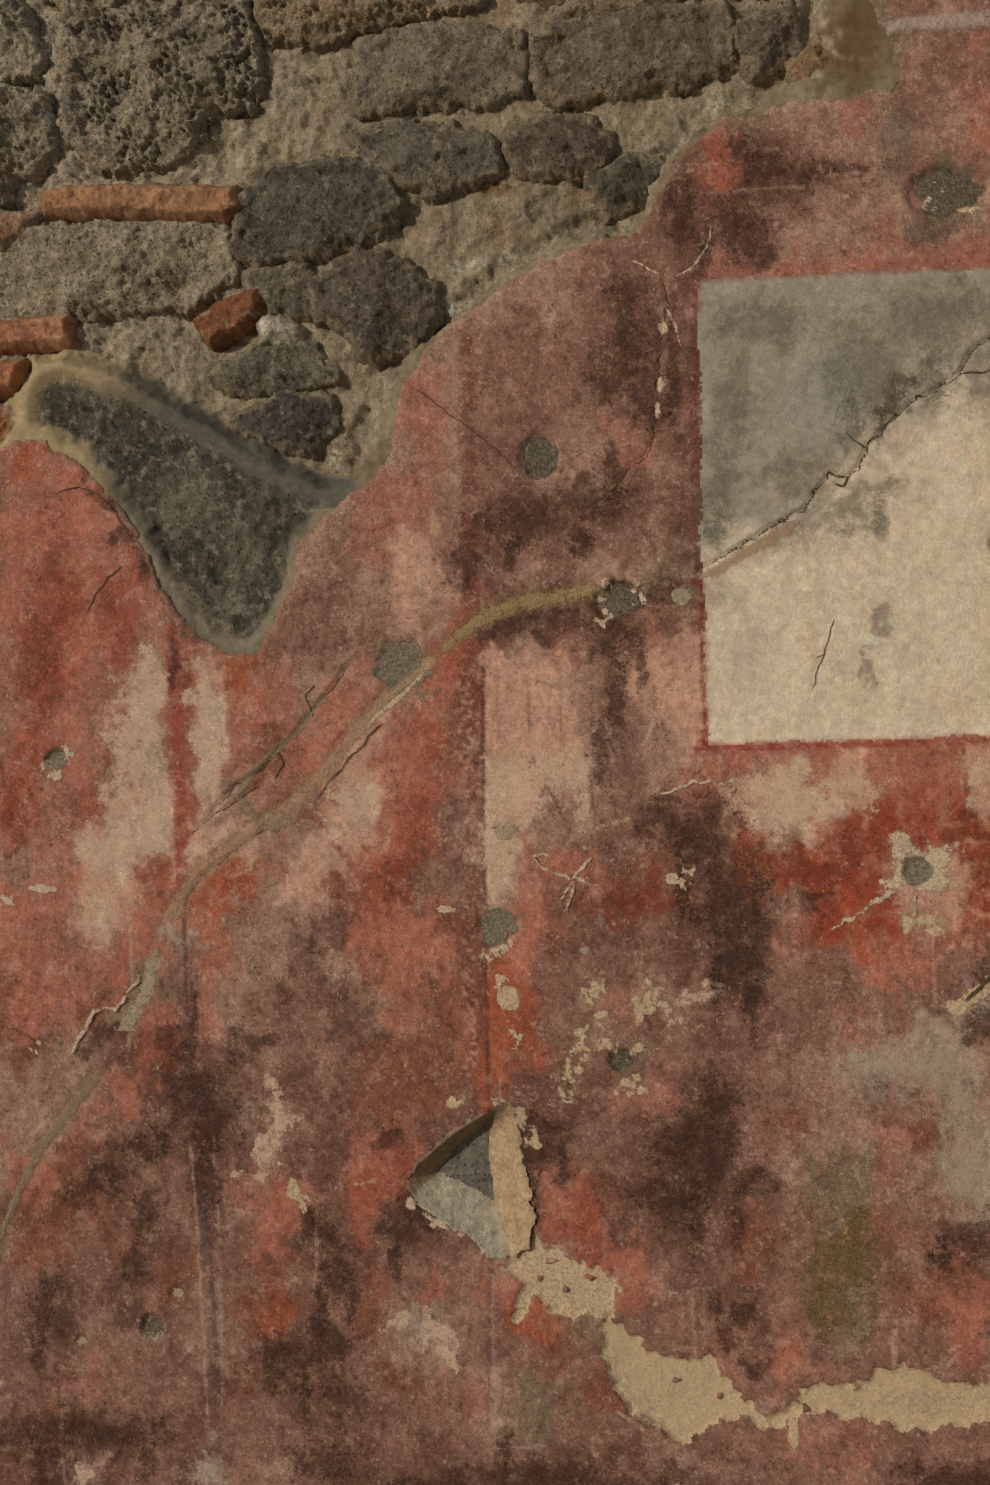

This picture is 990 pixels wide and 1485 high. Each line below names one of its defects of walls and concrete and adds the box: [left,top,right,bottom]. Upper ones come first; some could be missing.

crack [699,335,990,580]
spalling [588,577,651,629]
peeling [671,588,692,606]
crack [113,581,605,1031]
leakage [475,607,649,909]
leakage [634,758,899,1031]
flaking render [558,977,669,1104]
crack [0,1069,102,1258]
leakage [522,1117,579,1208]
leakage [628,1074,778,1252]
flaking render [405,1096,990,1452]